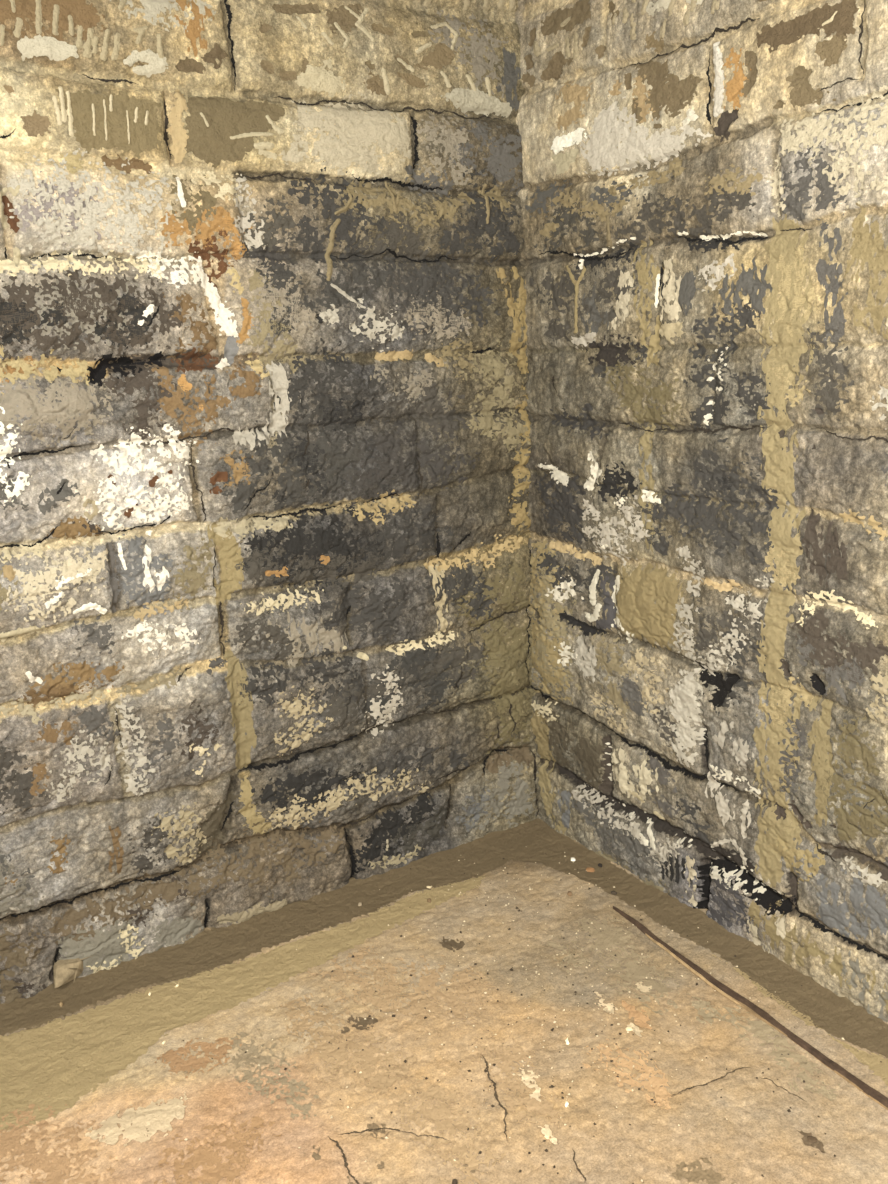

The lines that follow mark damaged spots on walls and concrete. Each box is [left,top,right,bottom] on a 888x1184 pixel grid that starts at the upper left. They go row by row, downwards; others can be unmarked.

crack [224,0,236,91]
crack [164,99,172,159]
crack [270,96,503,191]
damp [551,128,587,175]
corrosion [157,204,253,291]
crack [679,228,811,245]
damp [0,372,110,515]
damp [121,620,201,659]
damp [0,657,222,814]
damp [127,802,207,903]
damp [224,1029,321,1119]
crack [329,1127,446,1184]